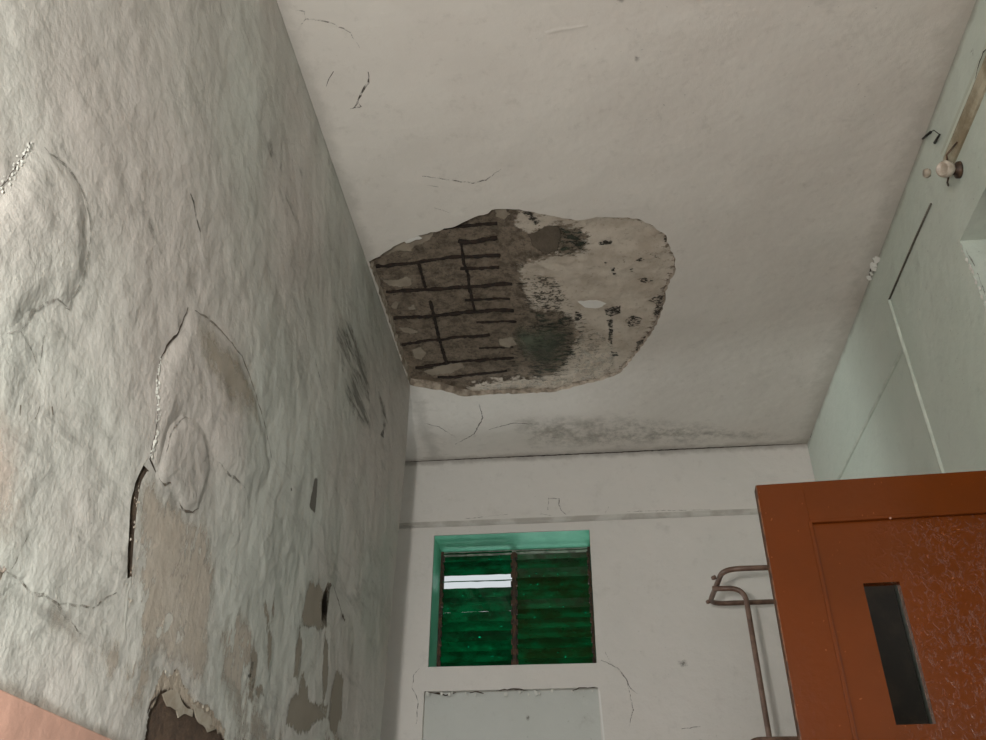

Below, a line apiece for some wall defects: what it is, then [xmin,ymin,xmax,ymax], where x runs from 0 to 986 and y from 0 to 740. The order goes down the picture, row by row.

crack [353,72,369,109]
spalling [369,209,676,397]
crack [411,405,812,462]
crack [15,458,156,641]
peeling [126,601,281,740]
peeling [285,582,345,740]